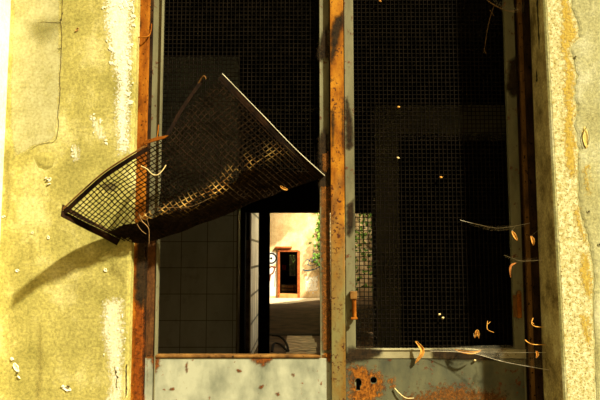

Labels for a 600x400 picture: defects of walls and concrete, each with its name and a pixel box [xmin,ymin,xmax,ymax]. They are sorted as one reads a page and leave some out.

crack [28,0,63,152]
flaking render [102,0,136,152]
flaking render [100,298,126,400]
corrosion [133,302,145,400]